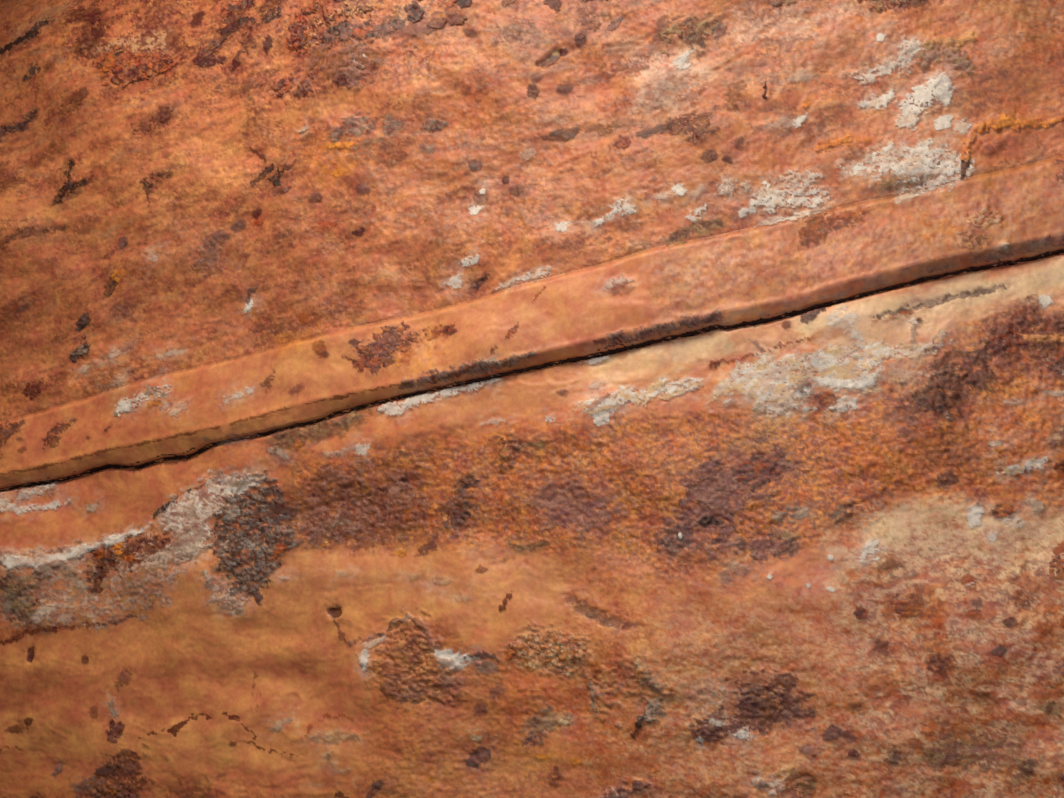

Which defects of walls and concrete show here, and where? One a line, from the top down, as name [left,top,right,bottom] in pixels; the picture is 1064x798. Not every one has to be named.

corrosion [192,0,477,98]
corrosion [527,0,623,98]
corrosion [542,110,743,163]
corrosion [342,321,457,373]
corrosion [398,351,536,393]
crack [0,250,1064,491]
corrosion [900,296,1064,428]
water stain [2,499,71,514]
crack [153,472,222,519]
corrosion [657,432,813,582]
corrosion [86,528,172,593]
corrosion [687,669,860,757]